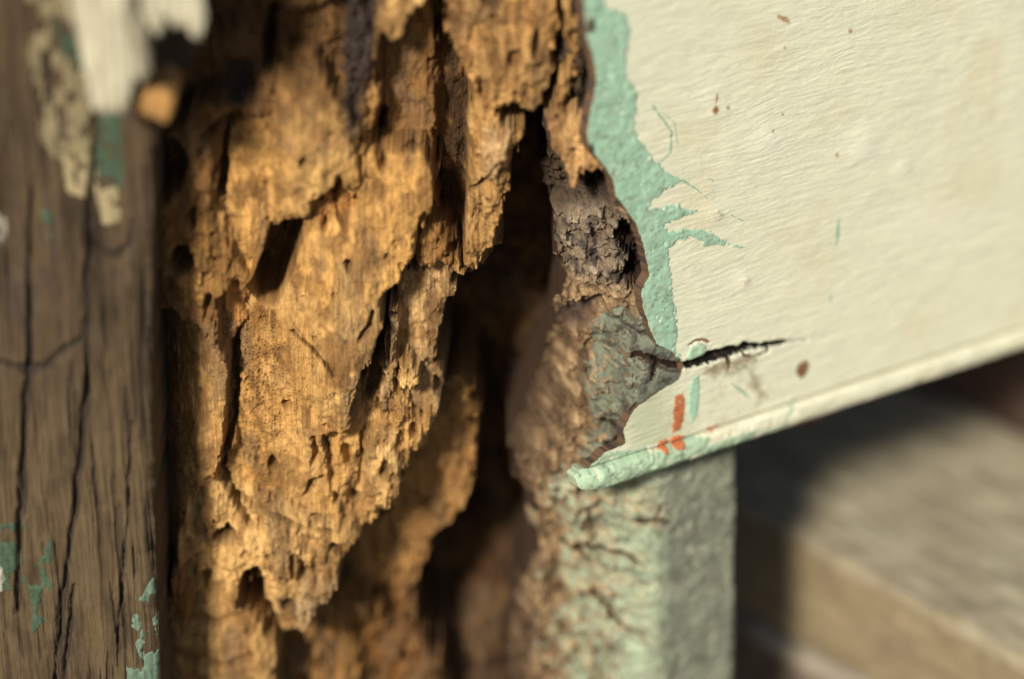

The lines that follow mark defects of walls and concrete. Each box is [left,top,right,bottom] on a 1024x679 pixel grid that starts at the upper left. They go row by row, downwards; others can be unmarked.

peeling [25,0,123,225]
crack [0,111,134,679]
peeling [166,0,796,679]
crack [629,338,805,381]
peeling [0,519,54,634]
peeling [126,575,159,679]